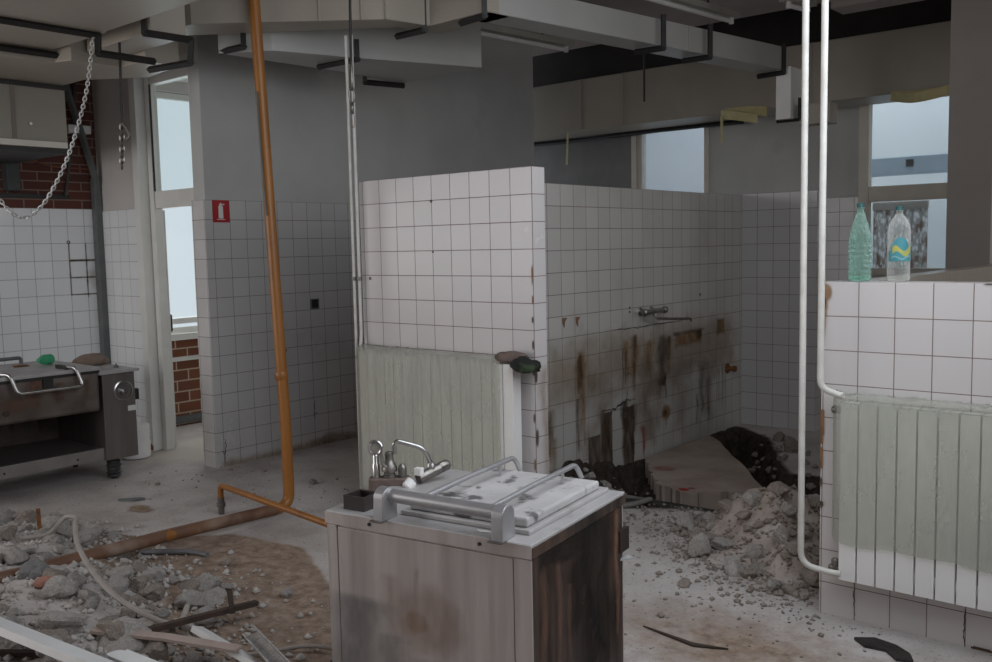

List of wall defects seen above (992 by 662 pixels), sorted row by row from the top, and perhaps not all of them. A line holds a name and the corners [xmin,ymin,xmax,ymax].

peeling [588,401,635,466]